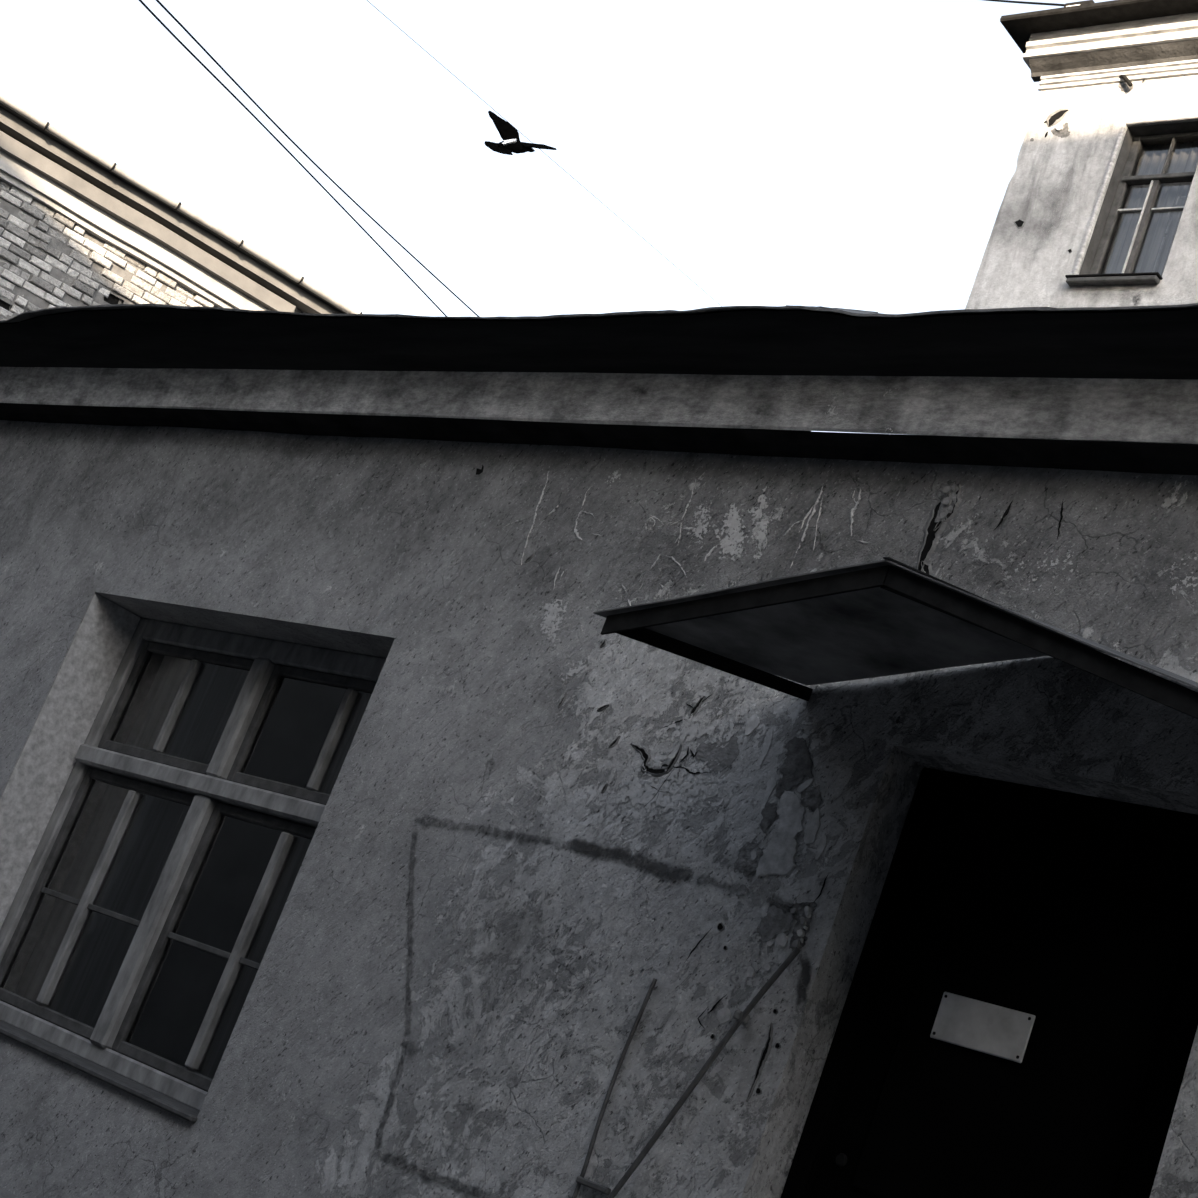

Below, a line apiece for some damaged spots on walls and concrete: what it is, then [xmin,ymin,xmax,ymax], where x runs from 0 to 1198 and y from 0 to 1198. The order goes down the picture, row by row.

spalling [1030,109,1070,141]
crack [504,466,600,575]
crack [620,480,721,606]
crack [780,486,871,573]
crack [916,480,962,576]
crack [631,695,711,807]
peeling [601,706,827,877]
peeling [756,902,817,951]